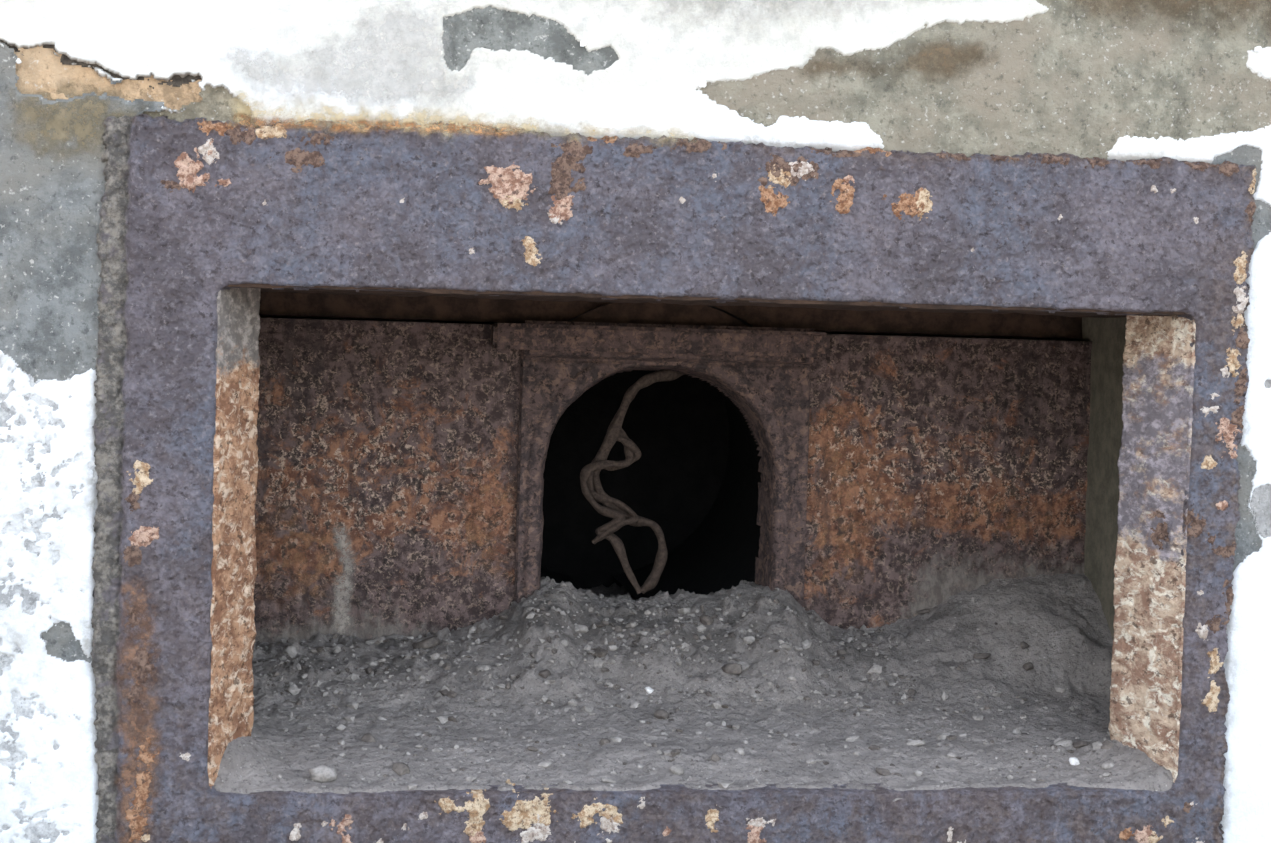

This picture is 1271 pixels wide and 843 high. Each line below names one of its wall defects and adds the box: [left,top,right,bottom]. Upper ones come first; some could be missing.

peeling [442,6,619,76]
corrosion [160,93,538,193]
corrosion [478,129,727,225]
corrosion [757,146,892,217]
peeling [696,0,1271,249]
peeling [0,43,259,565]
corrosion [1200,251,1250,470]
peeling [1232,444,1271,572]
peeling [0,559,92,663]
corrosion [1195,575,1234,714]
peeling [0,691,81,786]
corrosion [434,779,623,843]